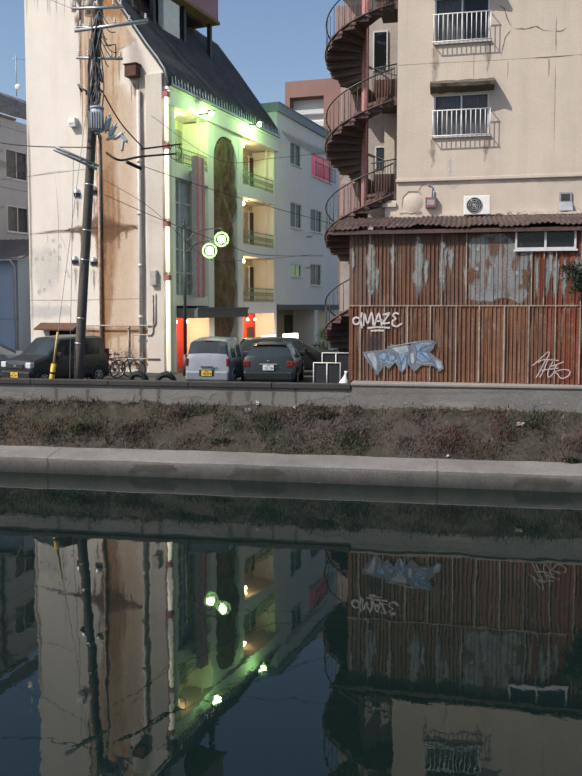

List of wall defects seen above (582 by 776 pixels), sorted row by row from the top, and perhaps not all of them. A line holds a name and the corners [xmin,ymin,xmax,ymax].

crack [408,6,570,76]
rust [48,0,148,365]
peeling [366,243,375,295]
peeling [413,237,423,290]
peeling [467,233,571,303]